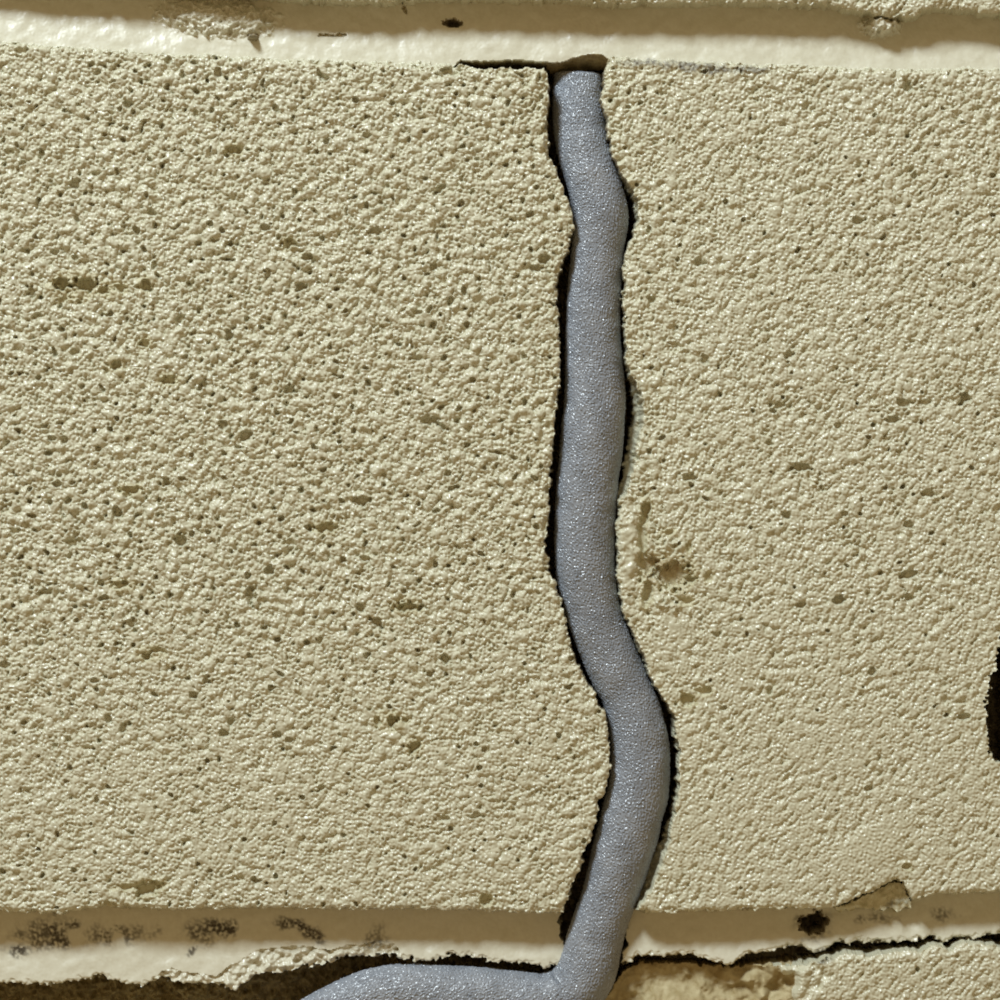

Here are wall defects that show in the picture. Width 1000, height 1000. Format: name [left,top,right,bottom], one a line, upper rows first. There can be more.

crack [455,54,678,844]
crack [0,243,611,1000]
mould [12,924,75,955]
mould [189,921,235,954]
spalling [154,940,403,991]
mould [280,919,322,943]
spalling [605,954,795,1000]
crack [616,933,1000,981]